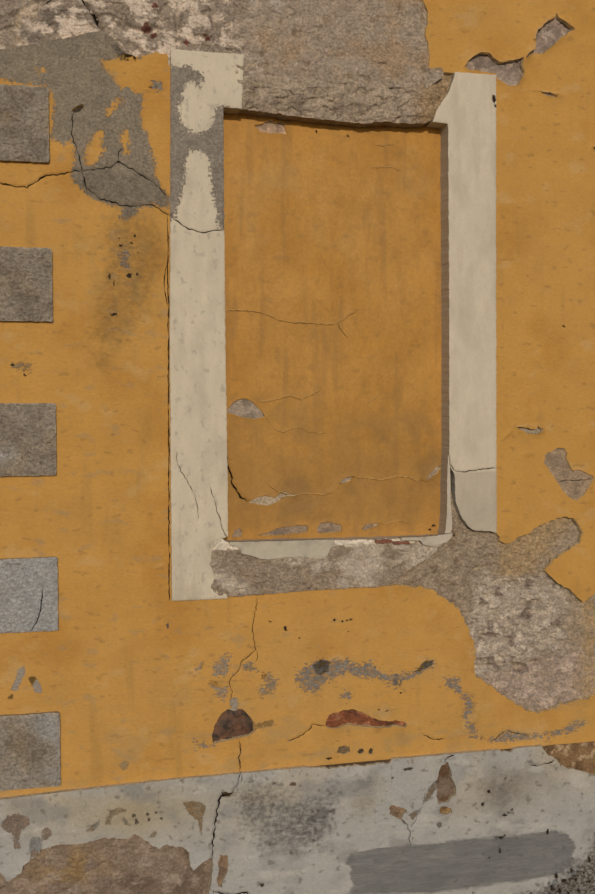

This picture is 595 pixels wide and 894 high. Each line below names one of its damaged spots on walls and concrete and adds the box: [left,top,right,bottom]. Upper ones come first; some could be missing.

flaking render [465,15,575,86]
spalling [0,0,444,231]
crack [0,114,248,599]
peeling [228,522,341,560]
spalling [374,493,595,711]
spalling [193,652,279,751]
crack [229,605,258,698]
peeling [294,657,436,696]
spalling [326,692,405,727]
crack [212,742,243,856]
spalling [423,762,455,828]
spalling [0,808,228,894]